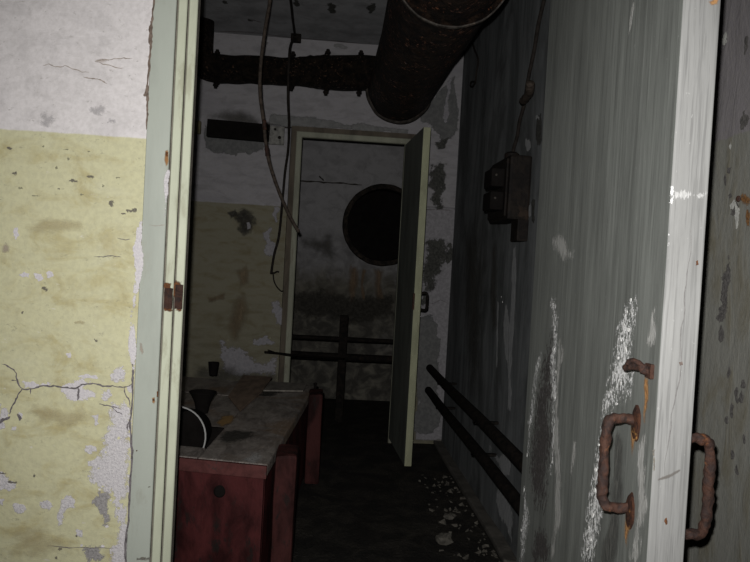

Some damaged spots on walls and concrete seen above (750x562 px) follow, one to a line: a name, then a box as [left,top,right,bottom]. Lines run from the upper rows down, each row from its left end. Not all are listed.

crack [44,57,132,84]
crack [0,364,134,424]
peeling [61,220,144,562]